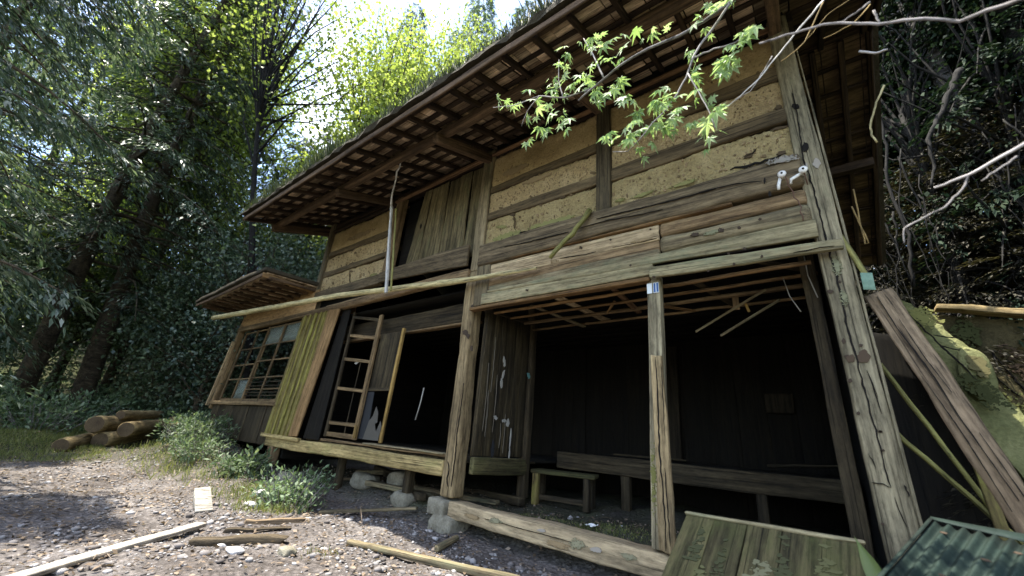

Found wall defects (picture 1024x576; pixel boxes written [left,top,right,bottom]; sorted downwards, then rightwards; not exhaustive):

spalling [612,80,782,164]
spalling [613,125,788,205]
crack [505,93,910,550]